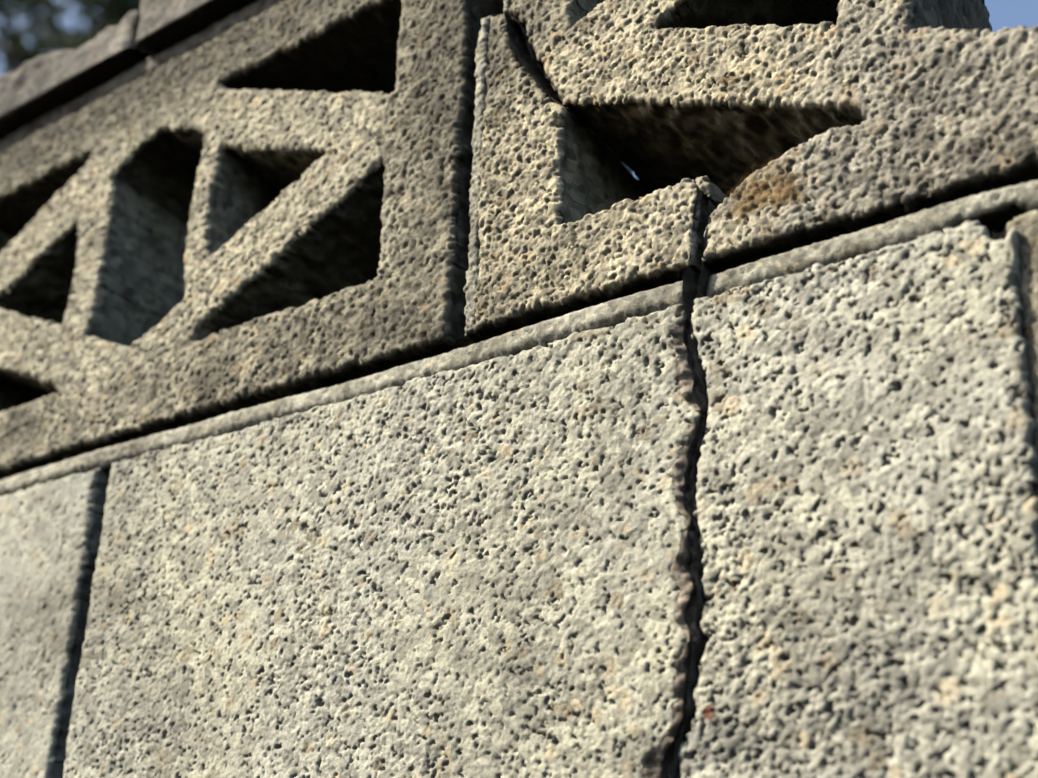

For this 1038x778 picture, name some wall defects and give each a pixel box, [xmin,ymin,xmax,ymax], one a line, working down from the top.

crack [504,10,608,150]
crack [642,186,717,778]